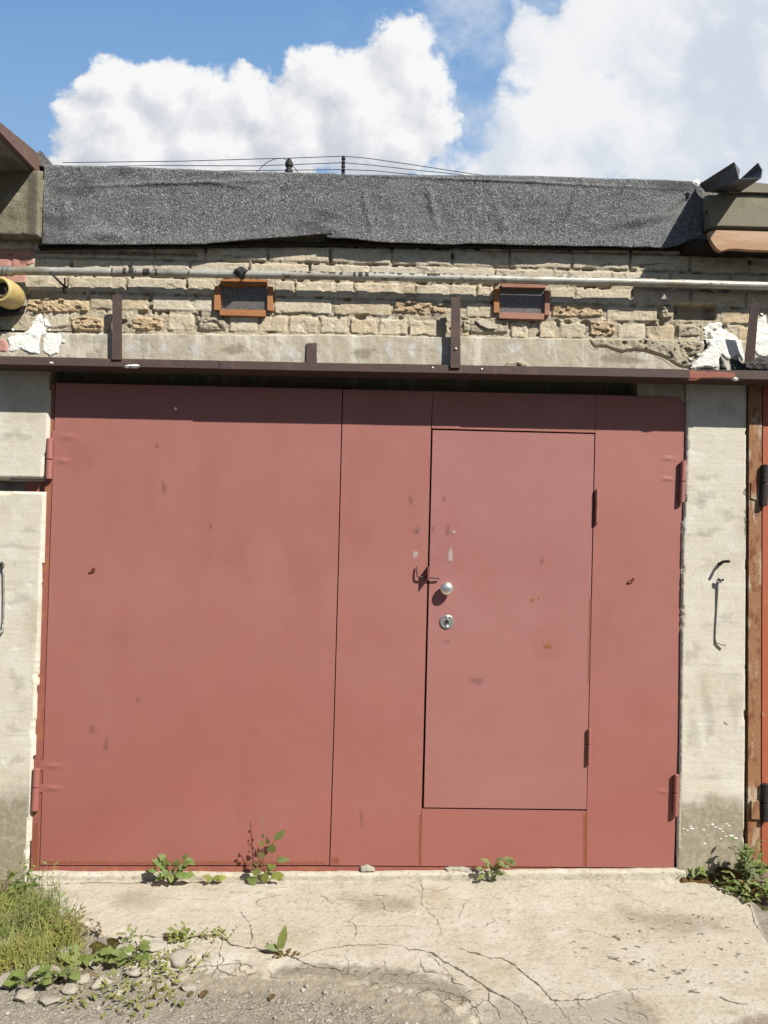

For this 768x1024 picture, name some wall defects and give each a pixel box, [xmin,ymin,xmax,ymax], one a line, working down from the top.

damp [679,800,744,878]
crack [96,884,654,1024]